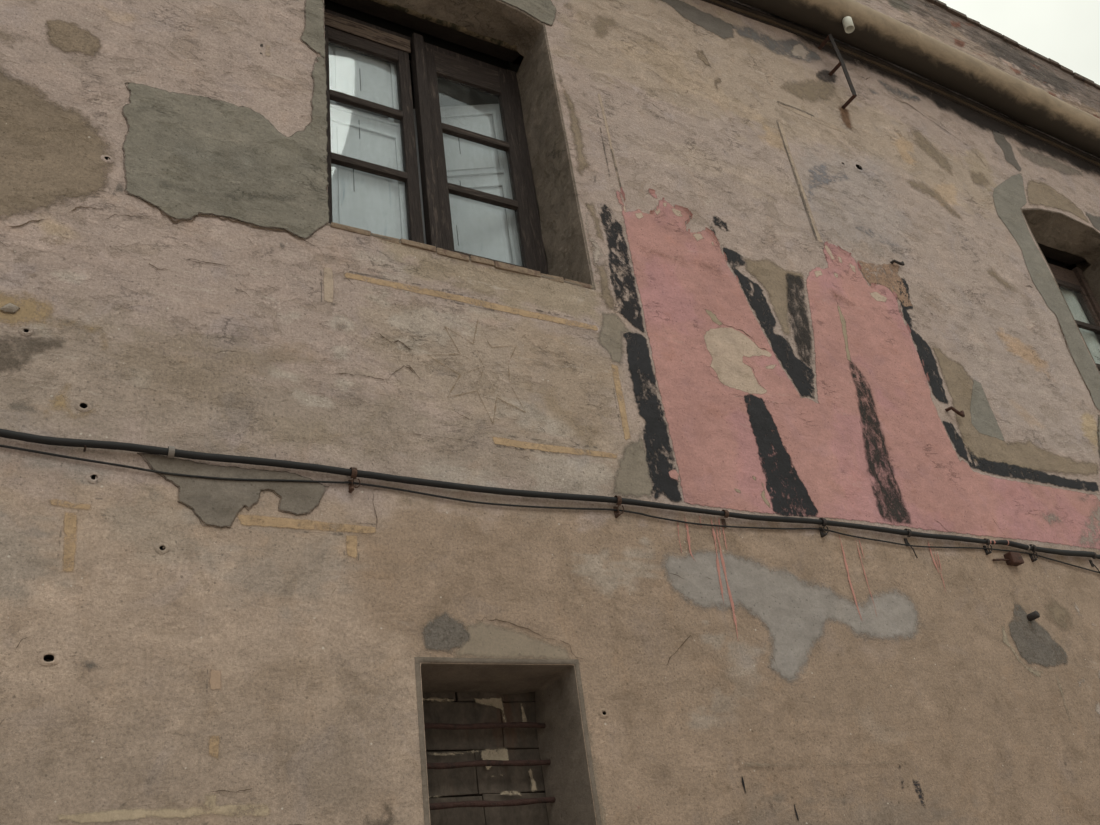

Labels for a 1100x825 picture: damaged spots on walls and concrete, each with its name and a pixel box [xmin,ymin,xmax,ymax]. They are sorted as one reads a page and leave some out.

spalling [47,20,101,56]
corrosion [817,70,837,82]
corrosion [840,108,851,128]
spalling [0,71,114,219]
spalling [704,310,775,394]
crack [483,617,582,659]